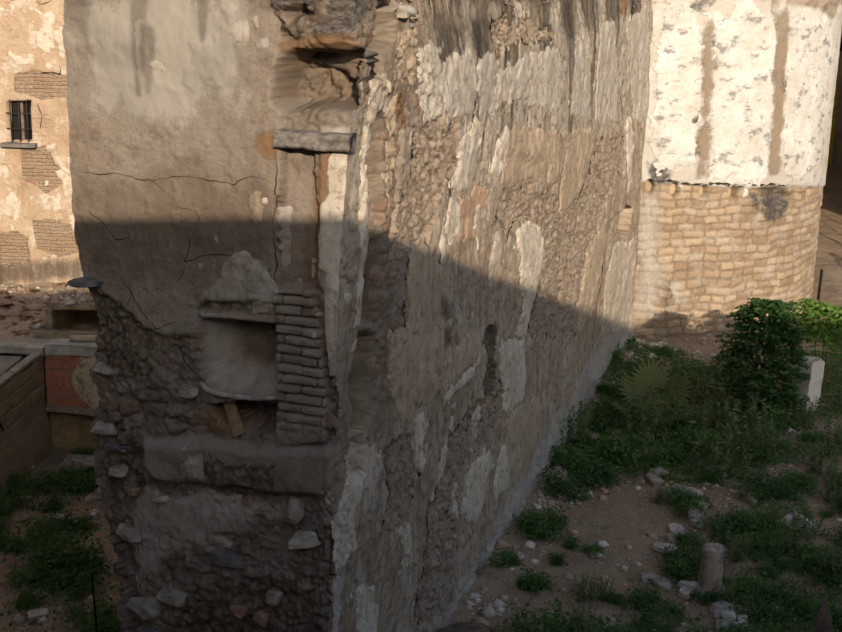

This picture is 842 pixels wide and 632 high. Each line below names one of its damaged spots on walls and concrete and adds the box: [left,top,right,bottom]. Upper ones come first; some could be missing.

spalling [0,0,68,100]
leakage [433,2,462,72]
leakage [472,0,490,58]
leakage [504,37,518,69]
leakage [560,0,599,98]
leakage [606,0,620,39]
spalling [0,142,79,267]
crack [79,147,279,283]
peeling [198,250,279,315]
peeling [271,206,293,270]
peeling [311,0,833,582]
spalling [70,287,321,632]